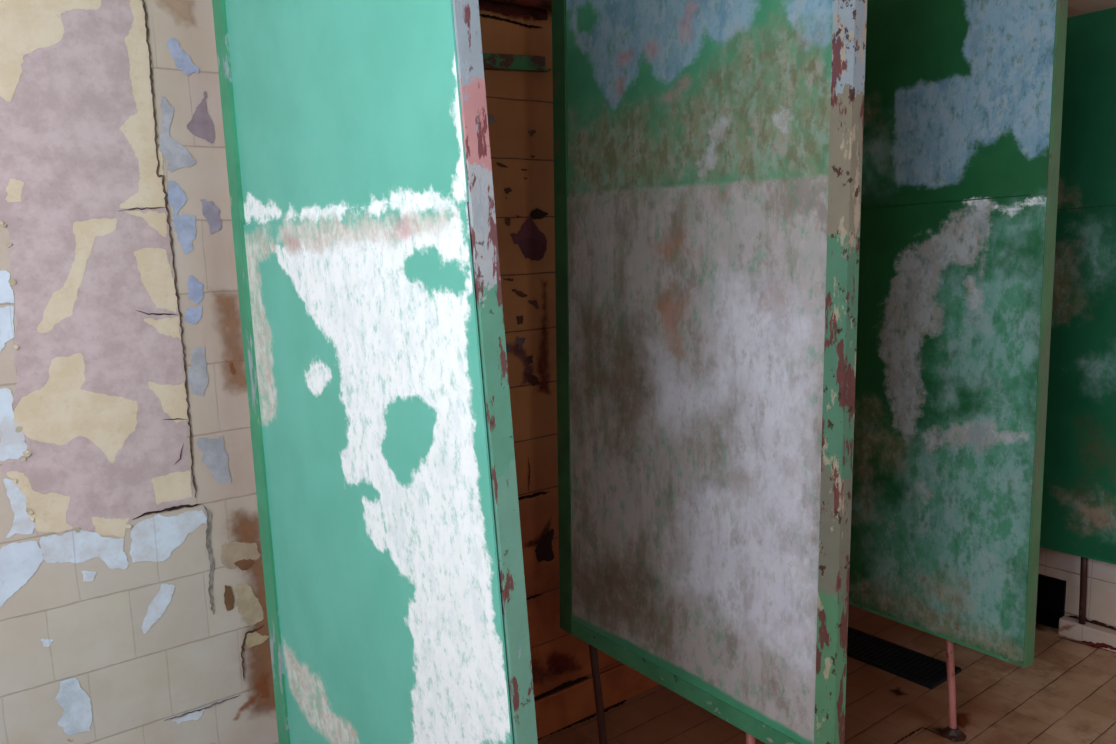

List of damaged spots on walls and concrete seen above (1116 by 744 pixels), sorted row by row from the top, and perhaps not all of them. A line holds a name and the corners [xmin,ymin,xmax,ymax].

peeling [505,208,548,261]
spalling [0,0,232,607]
crack [120,0,214,614]
peeling [503,278,541,386]
crack [518,459,550,501]
peeling [141,584,175,634]
spalling [220,540,269,648]
crack [534,677,589,701]